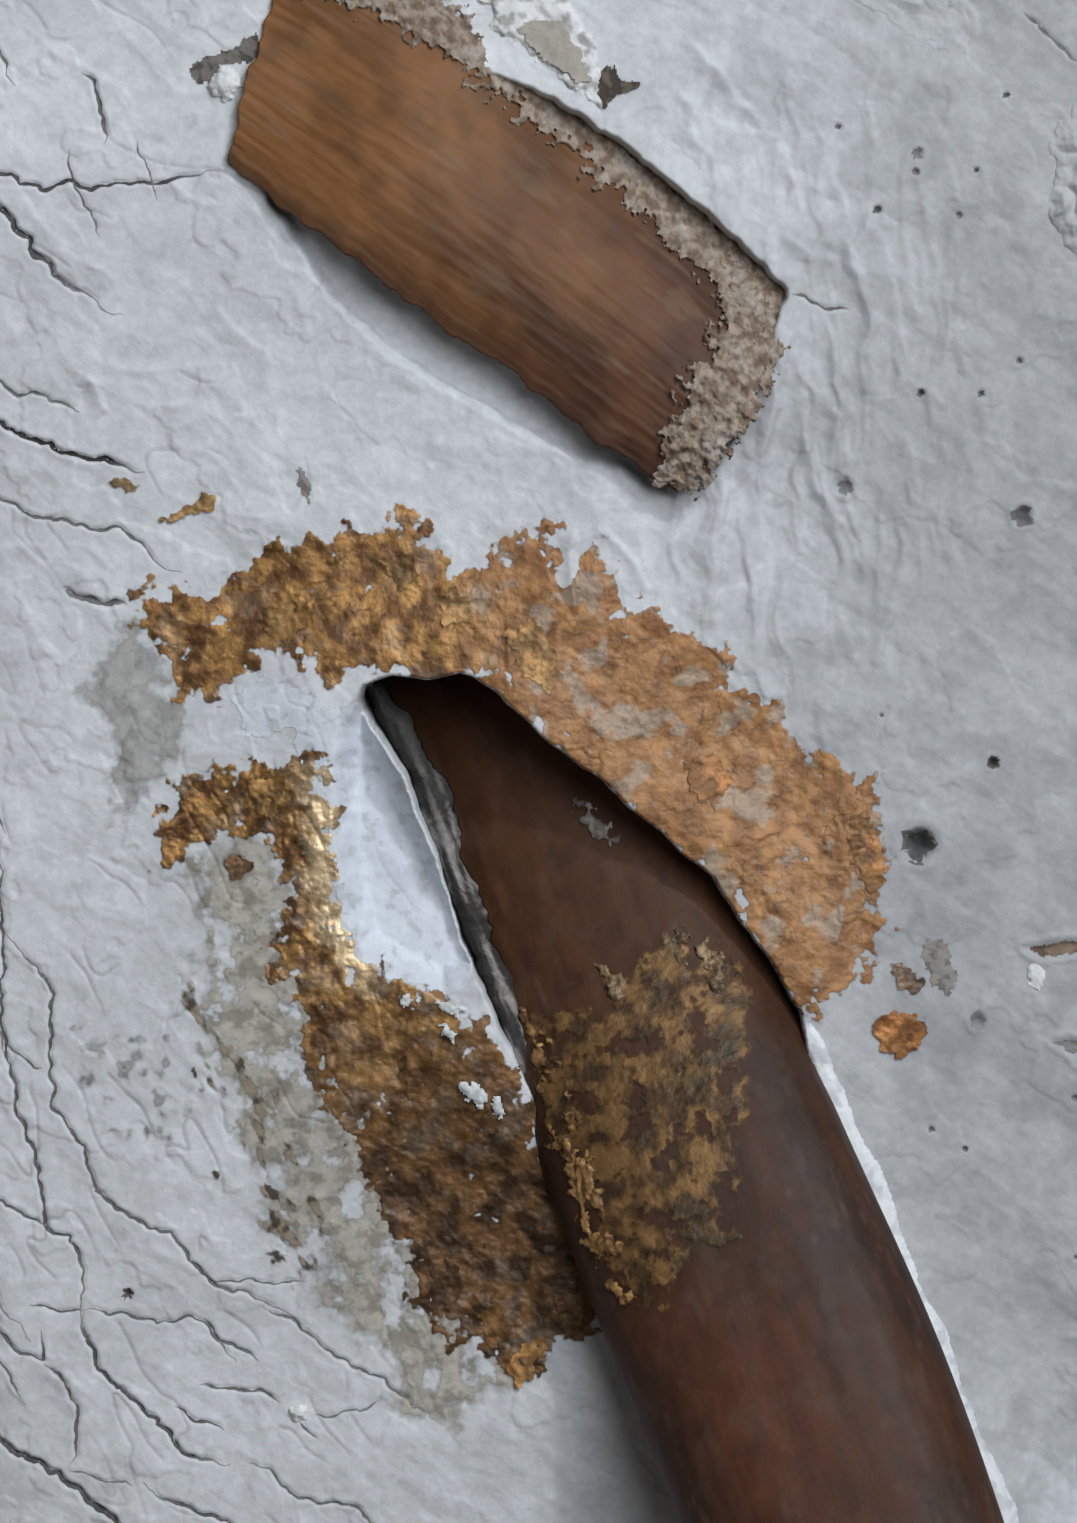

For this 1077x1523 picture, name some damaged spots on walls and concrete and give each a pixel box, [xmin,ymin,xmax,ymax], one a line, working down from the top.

spalling [190,32,259,102]
spalling [476,0,640,110]
crack [0,73,218,316]
crack [0,379,145,473]
crack [0,497,182,572]
leakage [84,618,185,810]
leakage [117,1038,171,1140]
crack [0,819,445,1523]
corrosion [182,983,324,1273]
leakage [187,830,516,1427]
peeling [517,1005,637,1305]
spalling [799,1021,1019,1523]